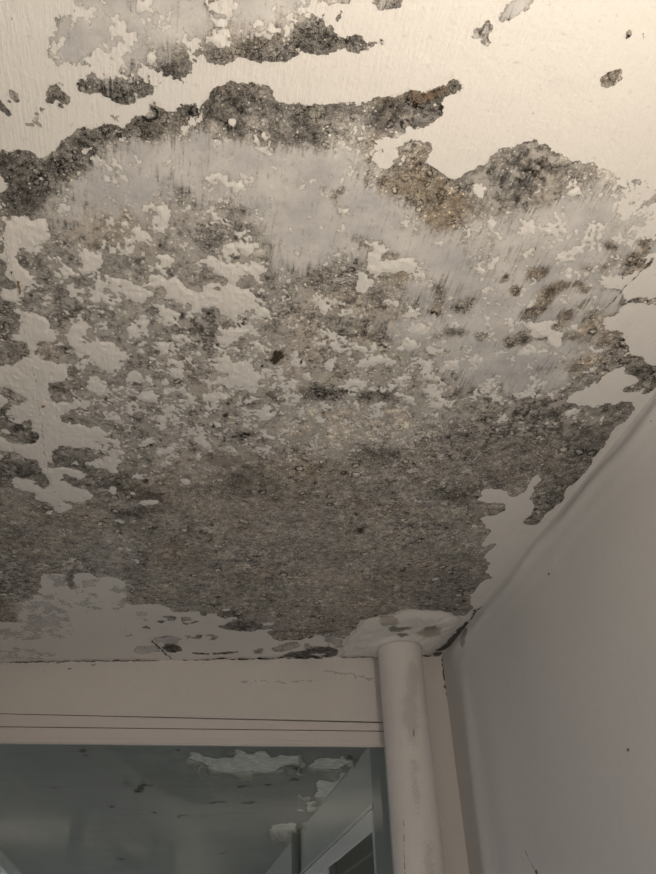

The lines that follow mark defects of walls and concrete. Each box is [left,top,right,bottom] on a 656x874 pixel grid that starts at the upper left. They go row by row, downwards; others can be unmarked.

peeling [0,0,656,659]
peeling [175,749,355,846]